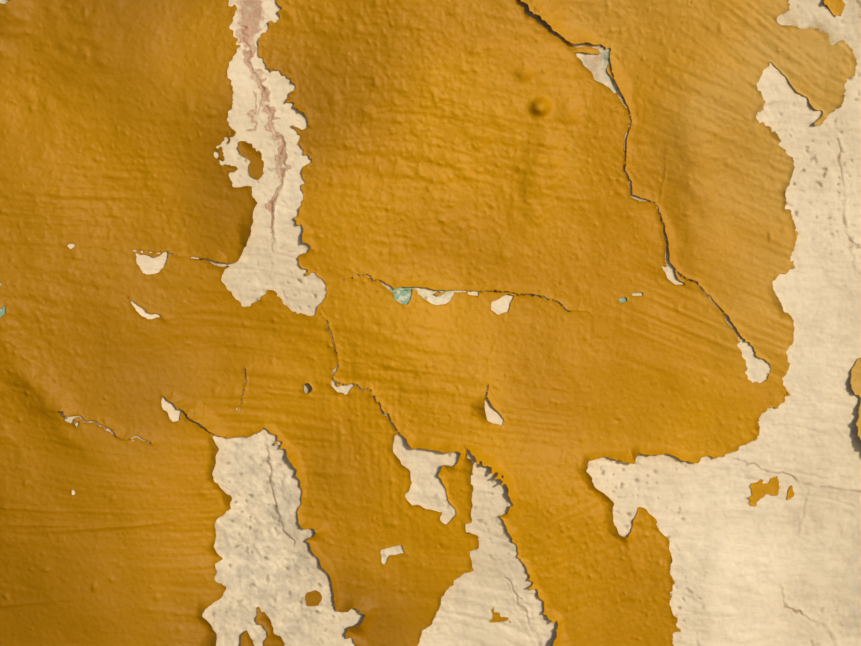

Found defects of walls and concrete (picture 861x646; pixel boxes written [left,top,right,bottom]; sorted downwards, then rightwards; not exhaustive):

crack [54,407,158,449]
crack [77,244,226,271]
peeling [132,245,174,279]
crack [237,27,288,253]
peeling [210,0,332,320]
peeling [194,415,385,646]
peeling [387,282,521,320]
peeling [386,428,578,646]
peeling [467,391,508,430]
crack [512,0,749,342]
peeling [573,0,861,646]
crack [780,586,839,646]